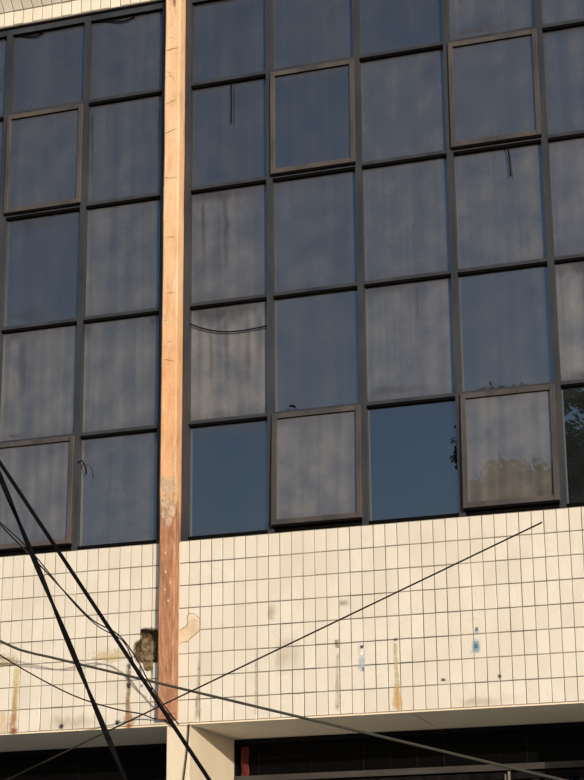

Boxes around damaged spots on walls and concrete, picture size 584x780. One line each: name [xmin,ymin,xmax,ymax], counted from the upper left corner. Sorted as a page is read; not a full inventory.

peeling [161,452,177,526]
spalling [134,628,158,671]
peeling [178,614,200,646]
rust [10,669,19,734]